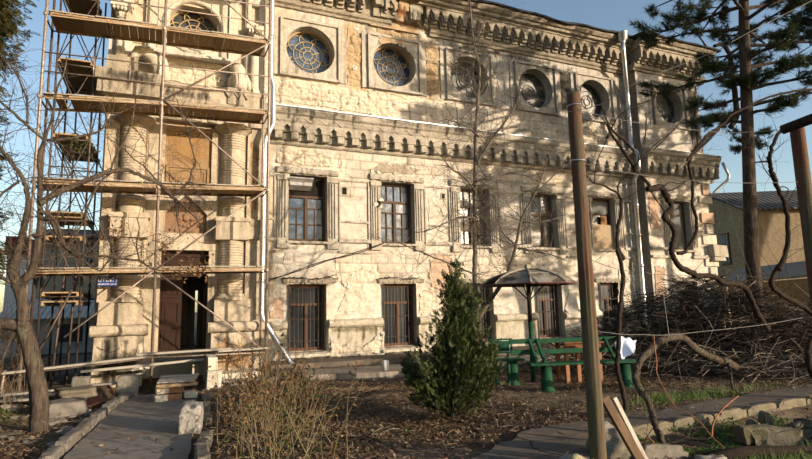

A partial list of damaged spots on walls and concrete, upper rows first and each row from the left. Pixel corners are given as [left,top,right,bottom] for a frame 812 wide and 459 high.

flaking render [270,27,400,116]
flaking render [375,28,485,125]